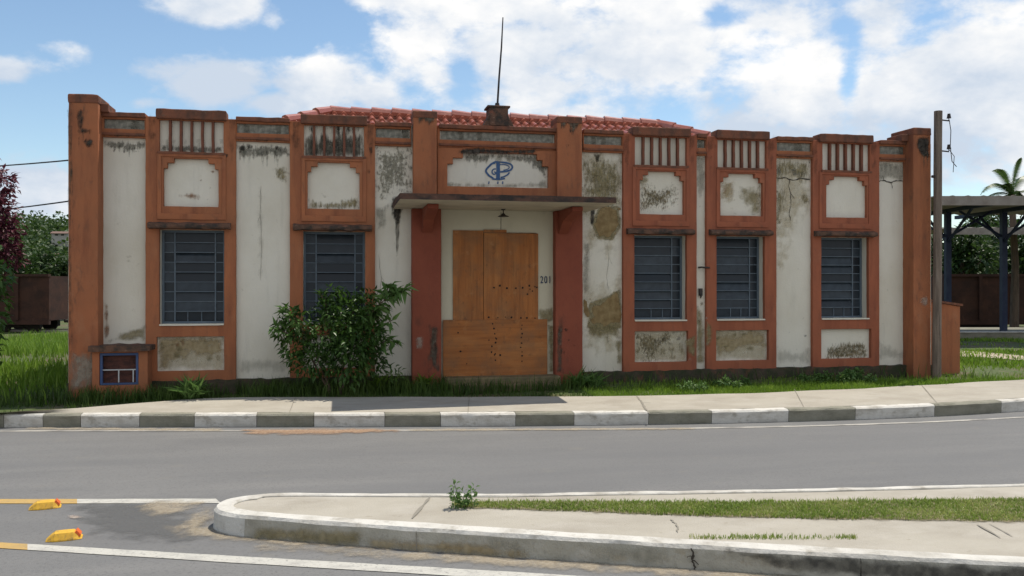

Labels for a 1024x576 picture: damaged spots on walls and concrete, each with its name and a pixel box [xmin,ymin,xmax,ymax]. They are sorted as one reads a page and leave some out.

water stain [68,111,145,154]
water stain [162,124,294,157]
water stain [441,122,621,186]
water stain [305,127,412,250]
spalling [591,186,621,240]
water stain [641,178,675,209]
water stain [723,183,760,211]
crack [778,171,810,221]
spalling [584,290,622,331]
water stain [826,343,866,359]
crack [687,548,699,571]